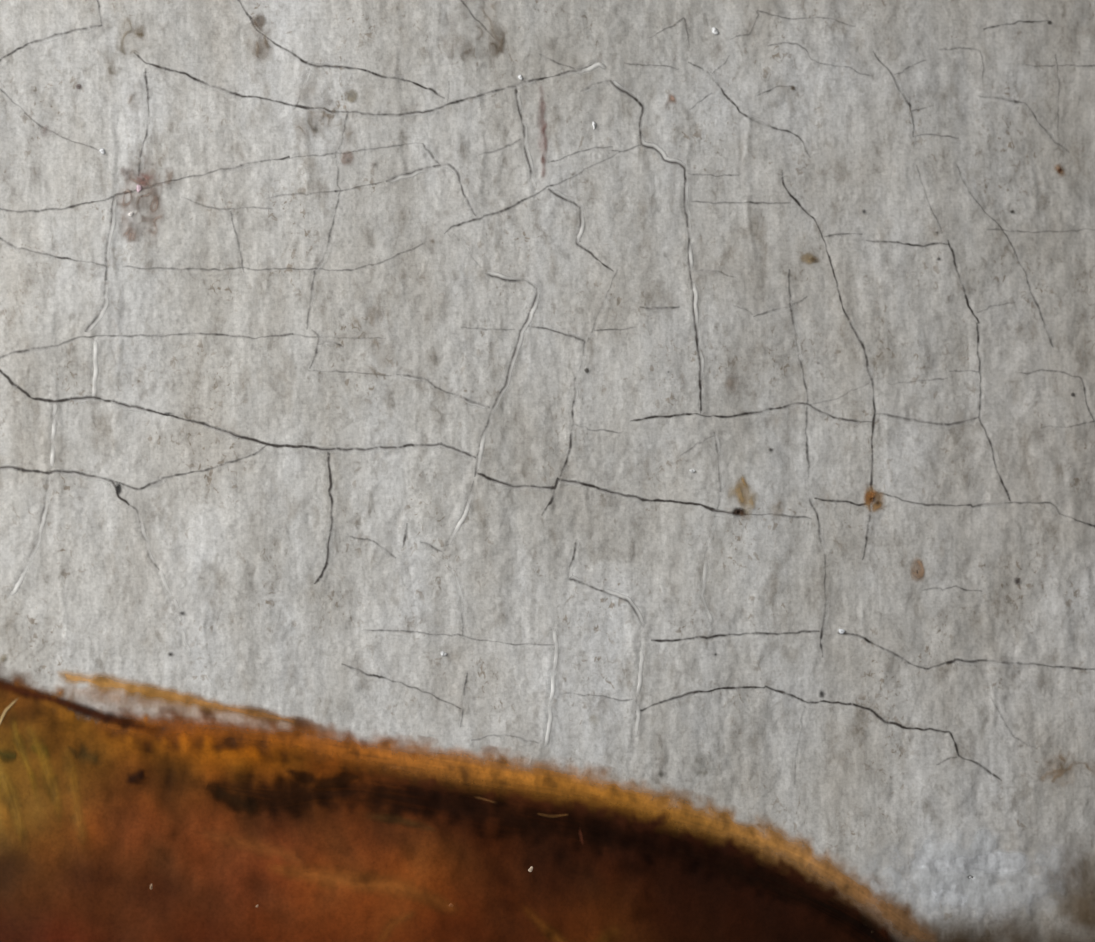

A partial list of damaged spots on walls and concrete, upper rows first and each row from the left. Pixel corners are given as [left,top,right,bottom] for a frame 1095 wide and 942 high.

crack [0,0,1017,607]
crack [545,632,558,744]
crack [568,542,1086,778]